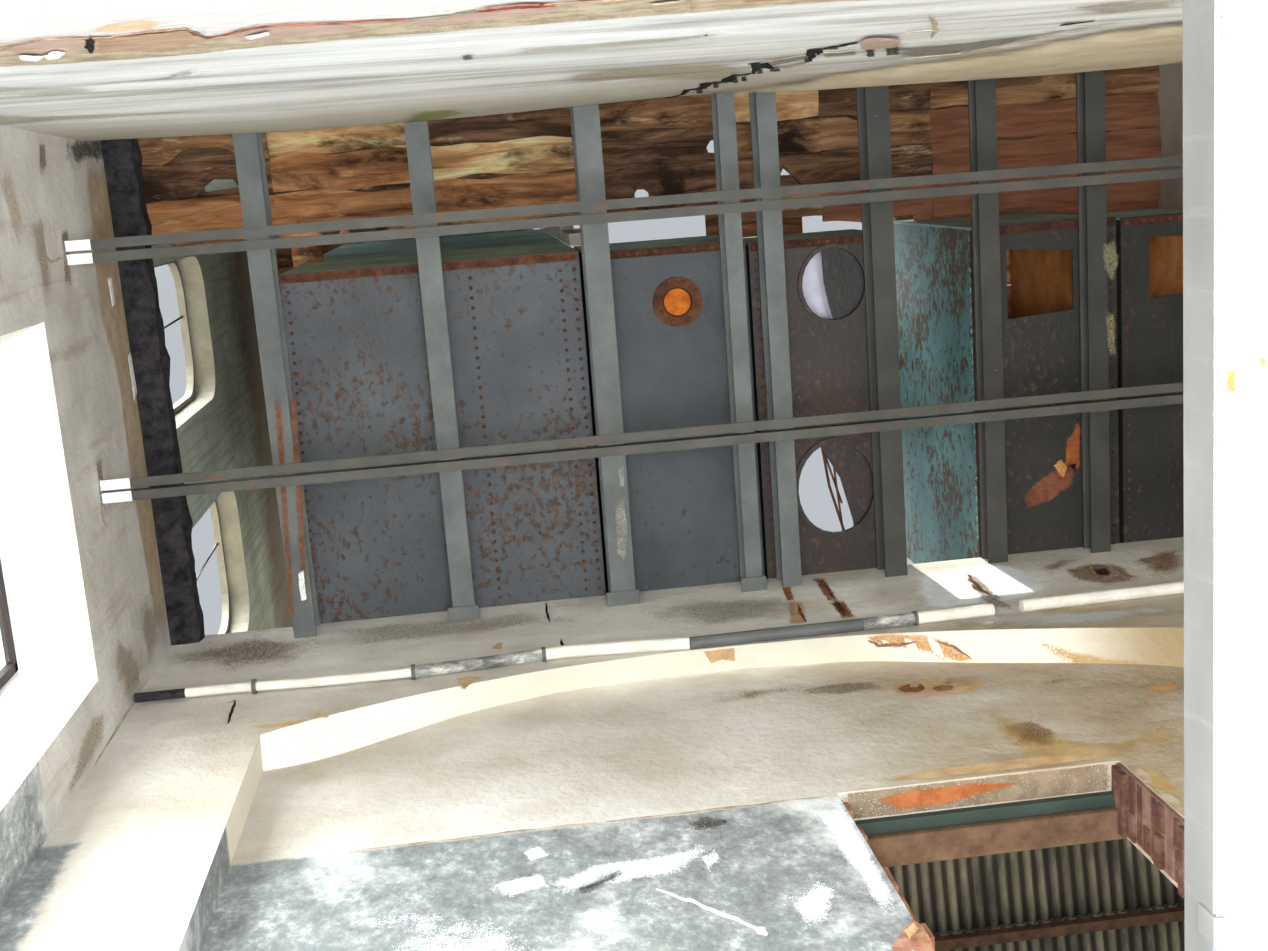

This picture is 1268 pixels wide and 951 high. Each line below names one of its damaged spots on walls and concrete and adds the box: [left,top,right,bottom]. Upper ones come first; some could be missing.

crack [0,0,867,67]
crack [666,42,860,98]
crack [897,17,1115,59]
corrosion [275,379,307,617]
corrosion [1022,420,1081,509]